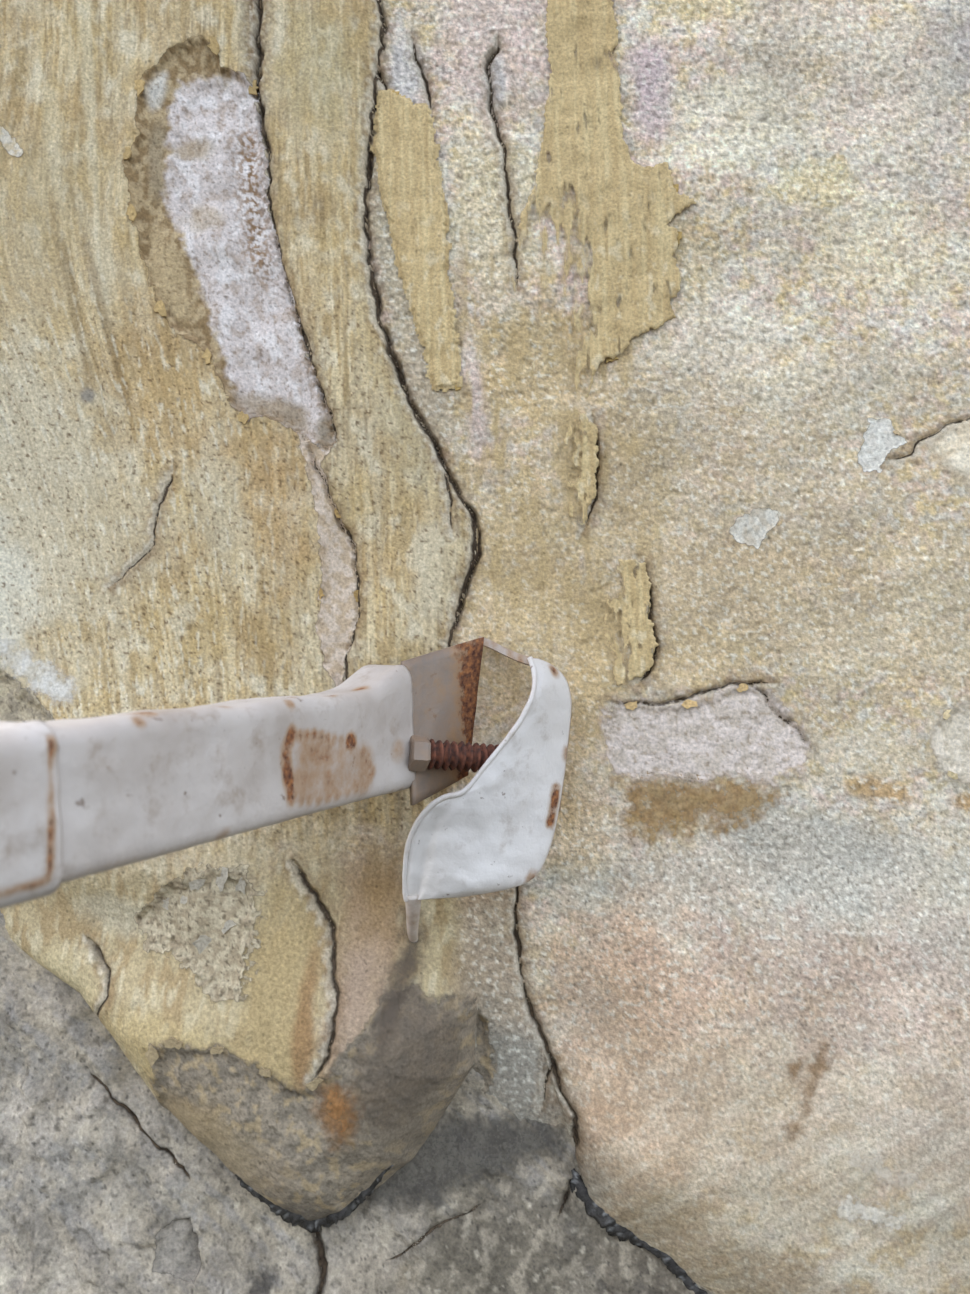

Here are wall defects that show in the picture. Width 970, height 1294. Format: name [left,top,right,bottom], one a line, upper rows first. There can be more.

flaking render [122,35,359,687]
peeling [370,89,463,392]
crack [363,0,481,647]
crack [486,47,518,279]
peeling [518,0,697,525]
spalling [0,668,54,722]
crack [118,476,173,581]
peeling [604,559,659,686]
flaking render [601,683,809,787]
crack [91,1074,190,1179]
crack [514,886,579,1146]
crack [314,1229,327,1294]